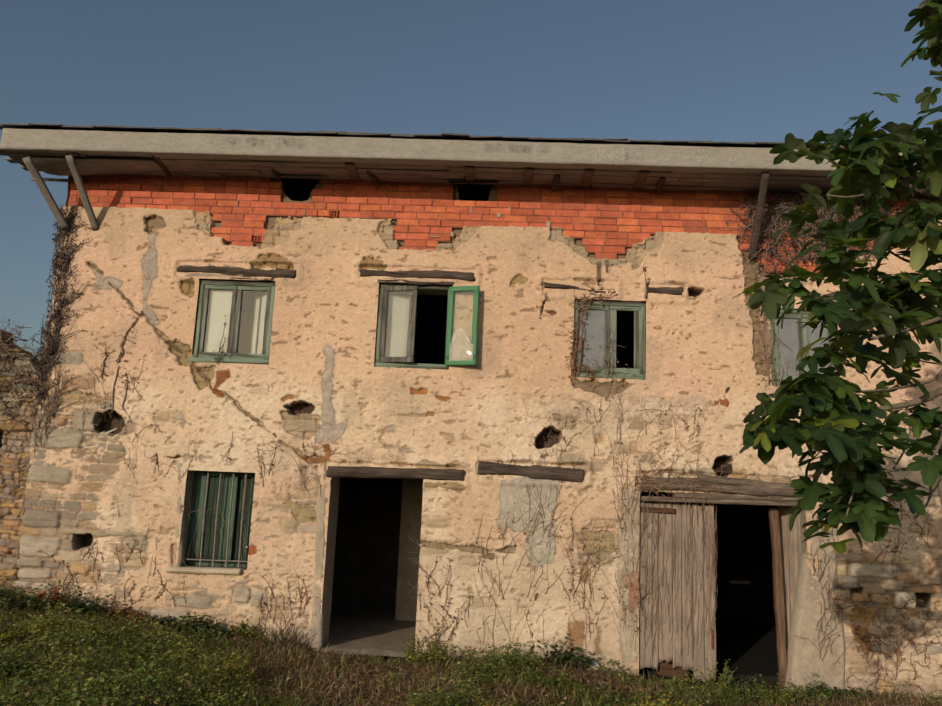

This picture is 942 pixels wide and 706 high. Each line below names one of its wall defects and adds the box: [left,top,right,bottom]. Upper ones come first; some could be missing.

spalling [250,216,303,270]
spalling [359,256,387,270]
spalling [378,219,399,249]
spalling [436,226,481,251]
spalling [548,228,665,266]
crack [87,262,170,364]
crack [194,364,322,459]
spalling [915,593,931,608]